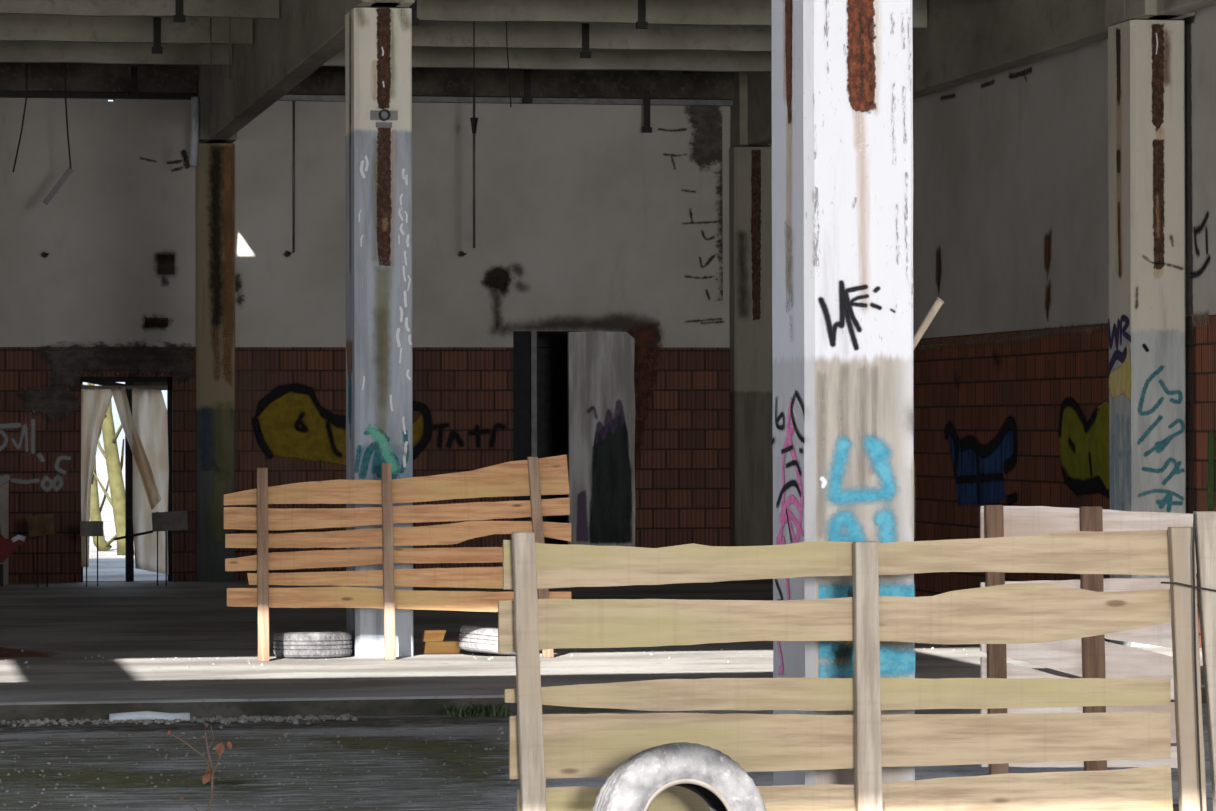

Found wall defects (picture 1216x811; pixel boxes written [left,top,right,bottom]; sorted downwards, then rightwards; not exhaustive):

corrosion [376,8,407,109]
corrosion [846,0,876,113]
corrosion [209,146,234,383]
corrosion [377,128,392,266]
water stain [482,266,523,332]
corrosion [1151,23,1169,269]
flaking render [18,317,196,421]
flaking render [503,315,661,456]